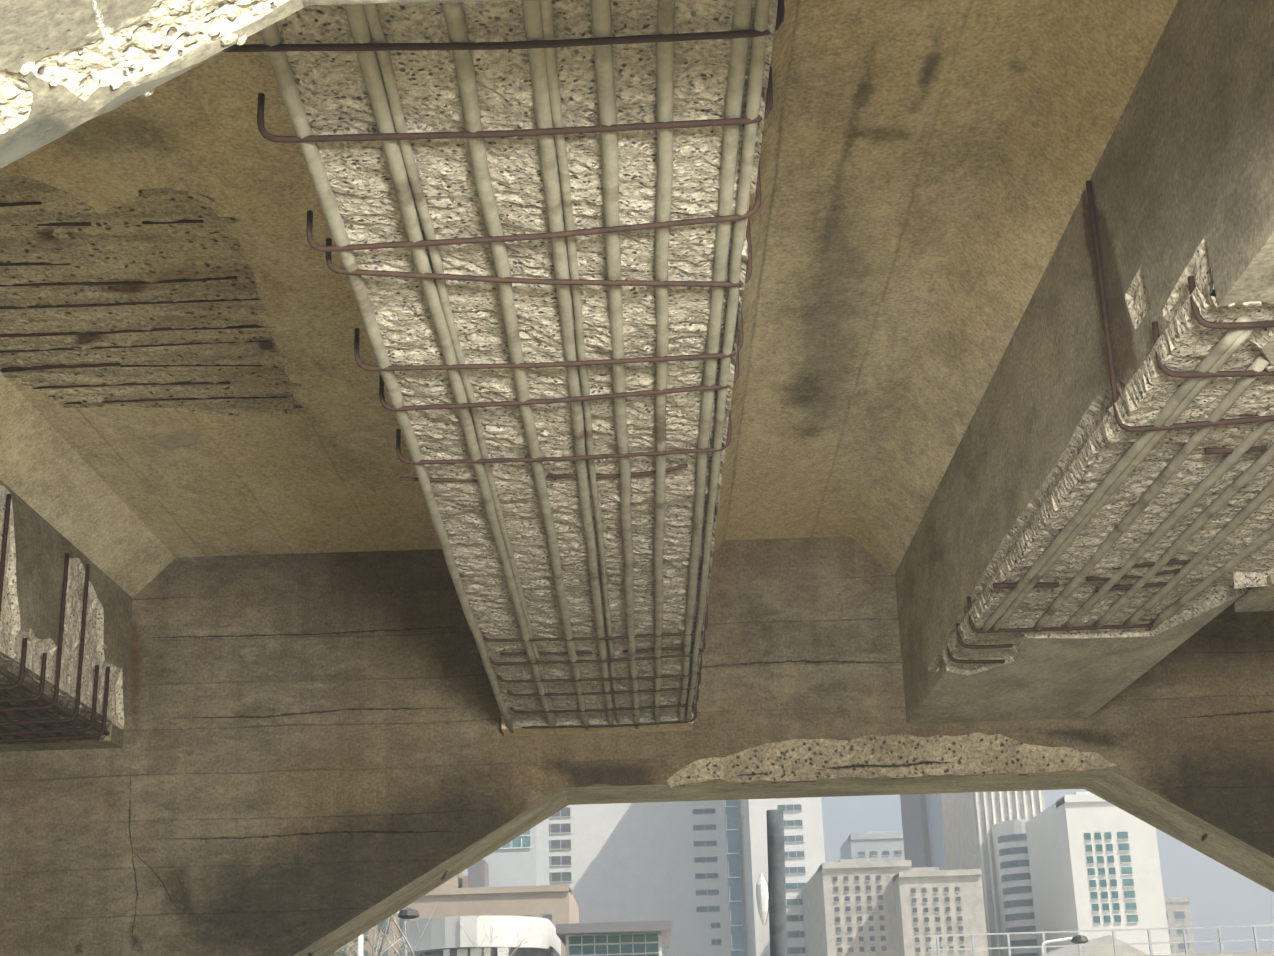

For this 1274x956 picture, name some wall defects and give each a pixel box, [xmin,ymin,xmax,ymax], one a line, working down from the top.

spalling [0,0,785,744]
spalling [927,180,1274,676]
spalling [665,732,1118,788]